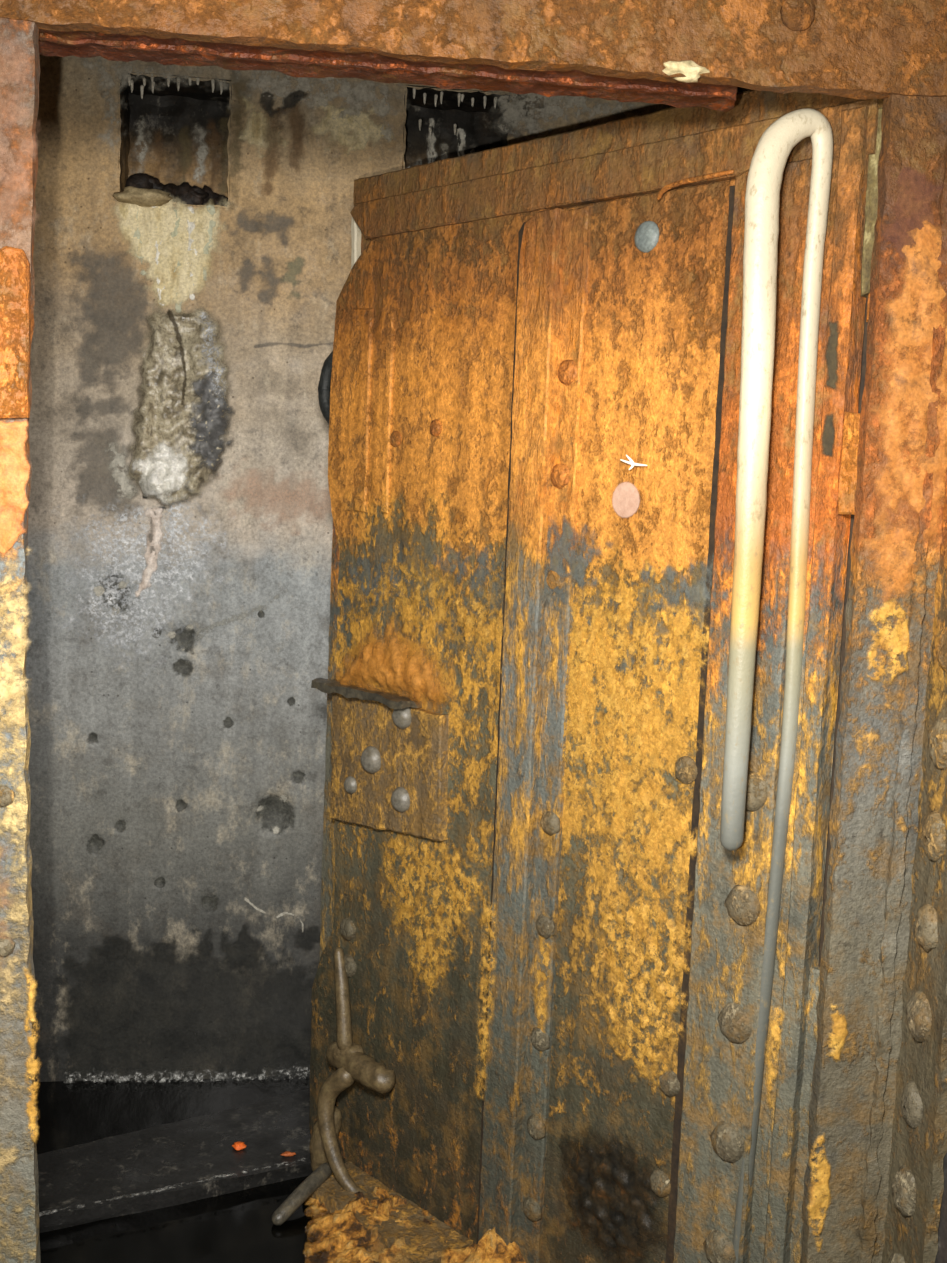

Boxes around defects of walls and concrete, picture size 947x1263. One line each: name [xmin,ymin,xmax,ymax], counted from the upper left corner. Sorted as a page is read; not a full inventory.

damp [84,61,392,182]
damp [72,174,219,383]
damp [239,258,280,302]
damp [238,214,292,244]
corrosion [0,420,30,555]
damp [78,398,124,416]
corrosion [822,414,835,457]
corrosion [825,322,838,389]
corrosion [870,221,947,602]
damp [244,898,320,950]
damp [57,928,316,1084]
corrosion [561,1136,665,1263]